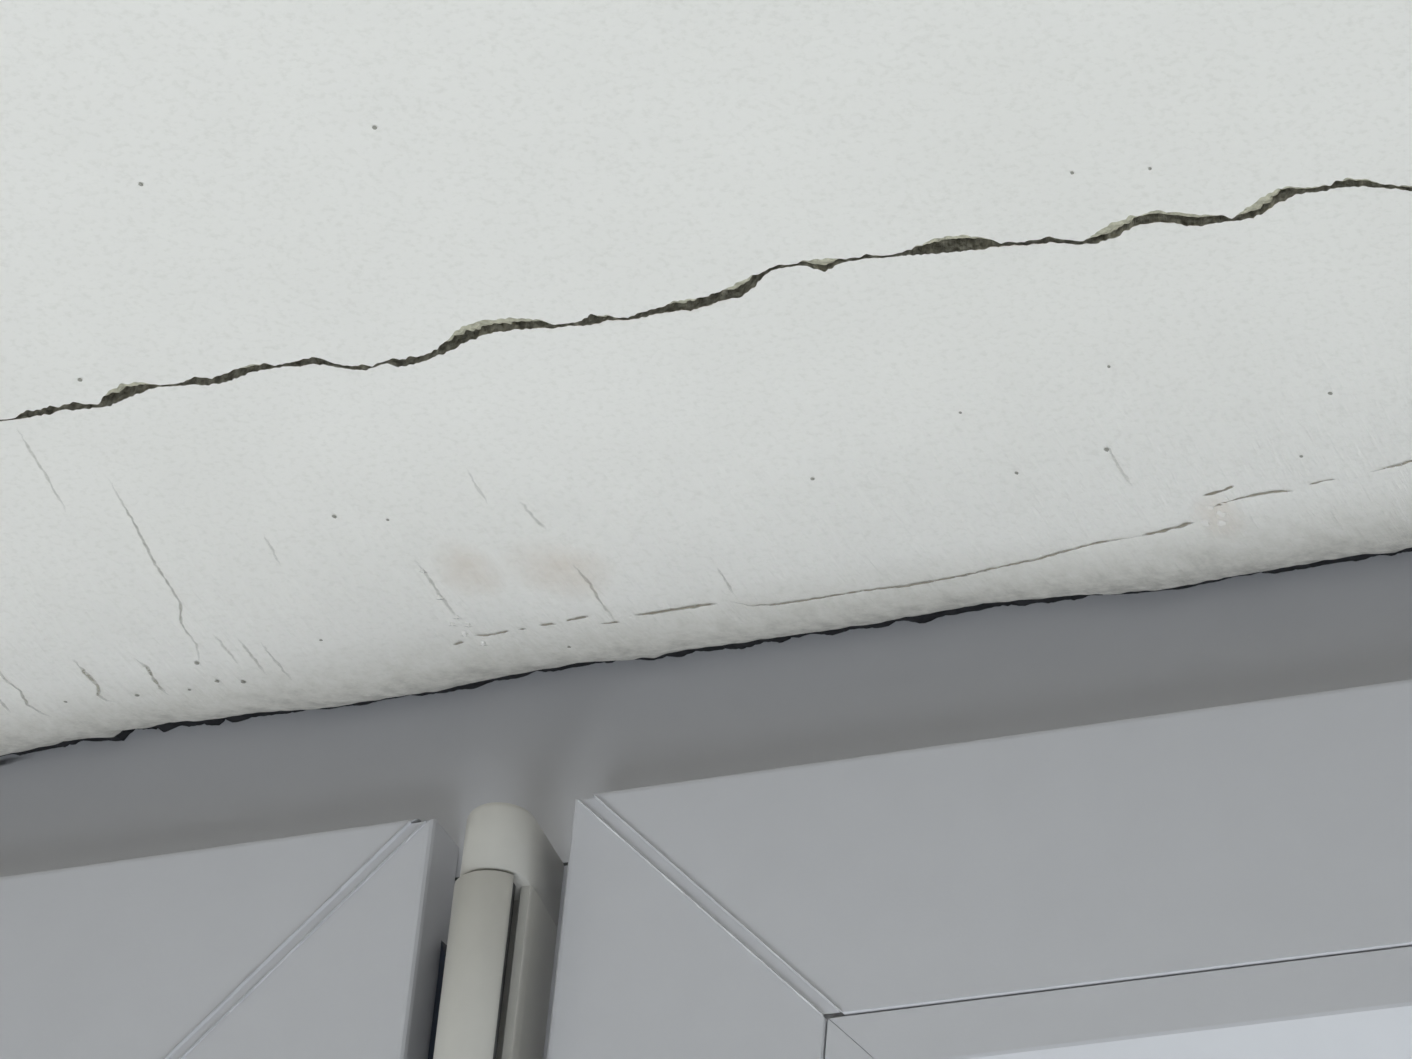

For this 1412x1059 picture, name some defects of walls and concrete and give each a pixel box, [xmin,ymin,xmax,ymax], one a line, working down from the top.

crack [0,178,1412,421]
crack [0,479,1412,757]